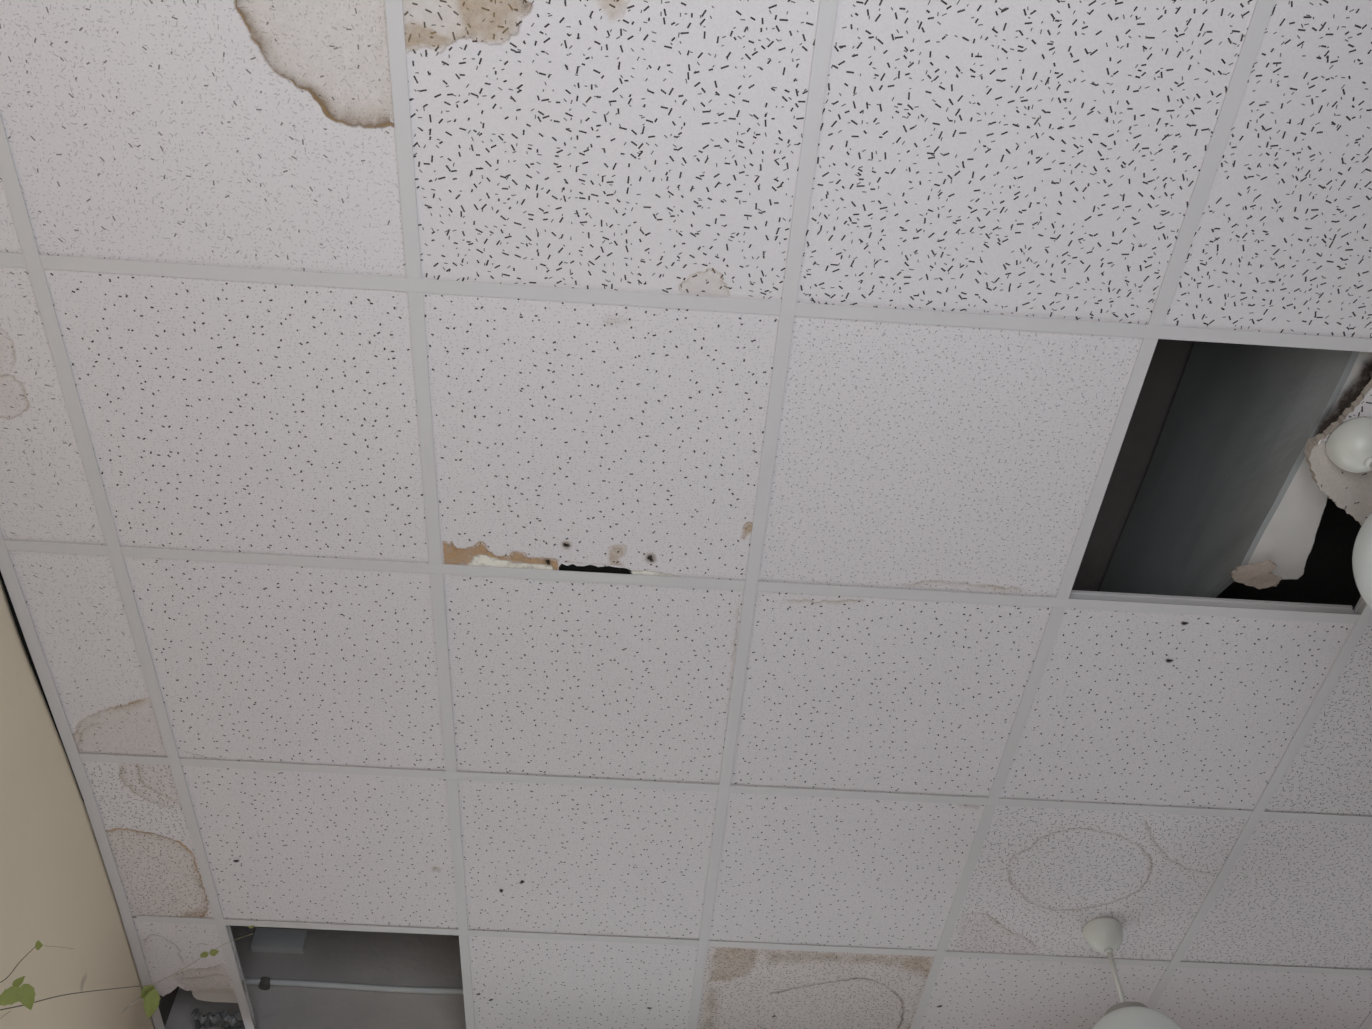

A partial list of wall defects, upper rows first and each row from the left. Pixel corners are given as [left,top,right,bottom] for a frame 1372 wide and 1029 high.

leakage [235,0,263,53]
leakage [274,70,394,128]
spalling [546,560,632,574]